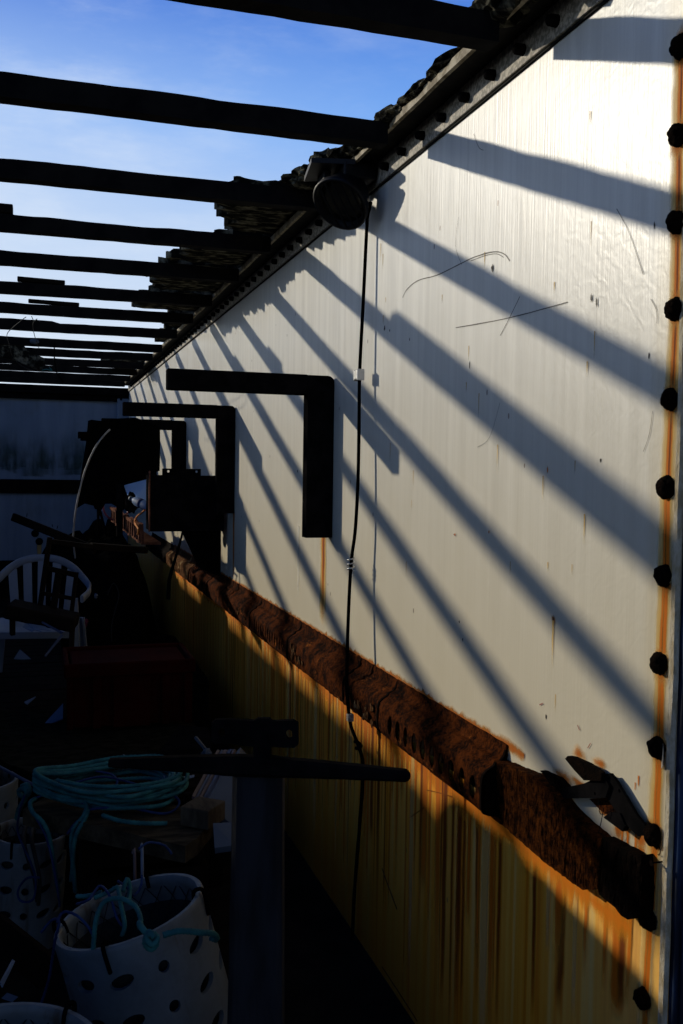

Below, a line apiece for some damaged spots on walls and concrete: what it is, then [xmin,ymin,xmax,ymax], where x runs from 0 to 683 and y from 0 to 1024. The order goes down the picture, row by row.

rust [654,671,666,741]
rust [170,511,659,1018]
rust [638,758,663,830]